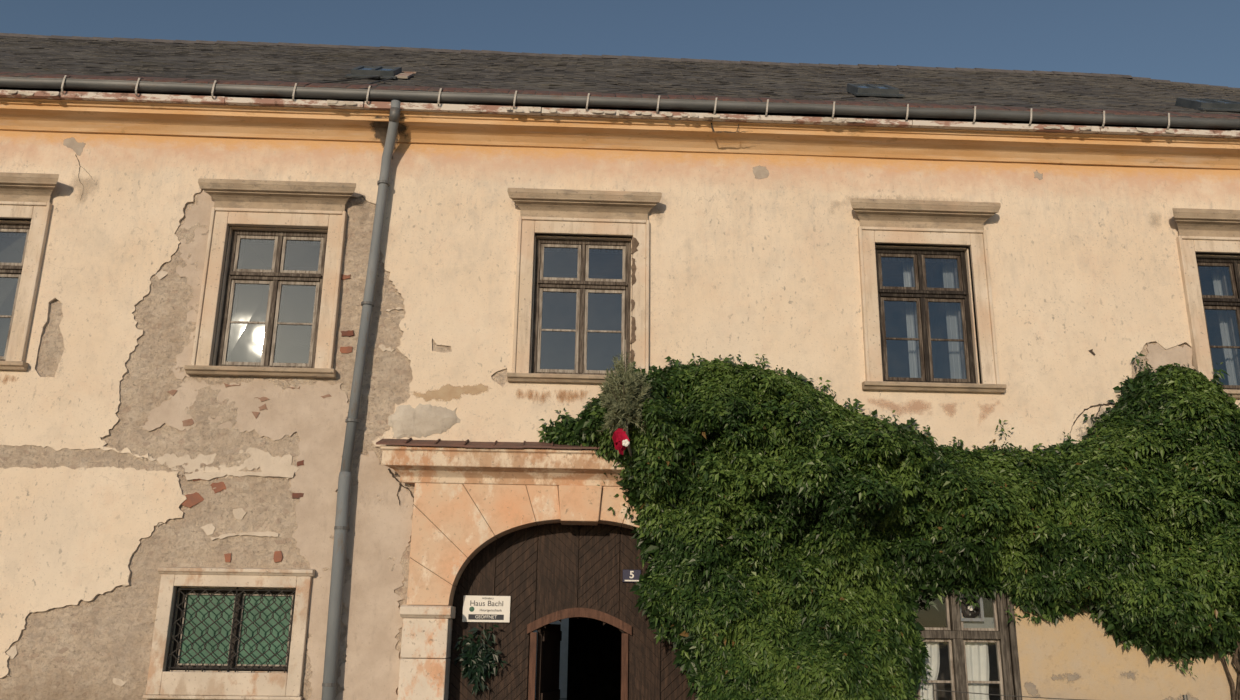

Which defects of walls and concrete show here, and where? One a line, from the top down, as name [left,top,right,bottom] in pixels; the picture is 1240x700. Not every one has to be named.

damp [370,114,407,159]
spalling [1128,342,1194,388]
spalling [0,190,507,700]